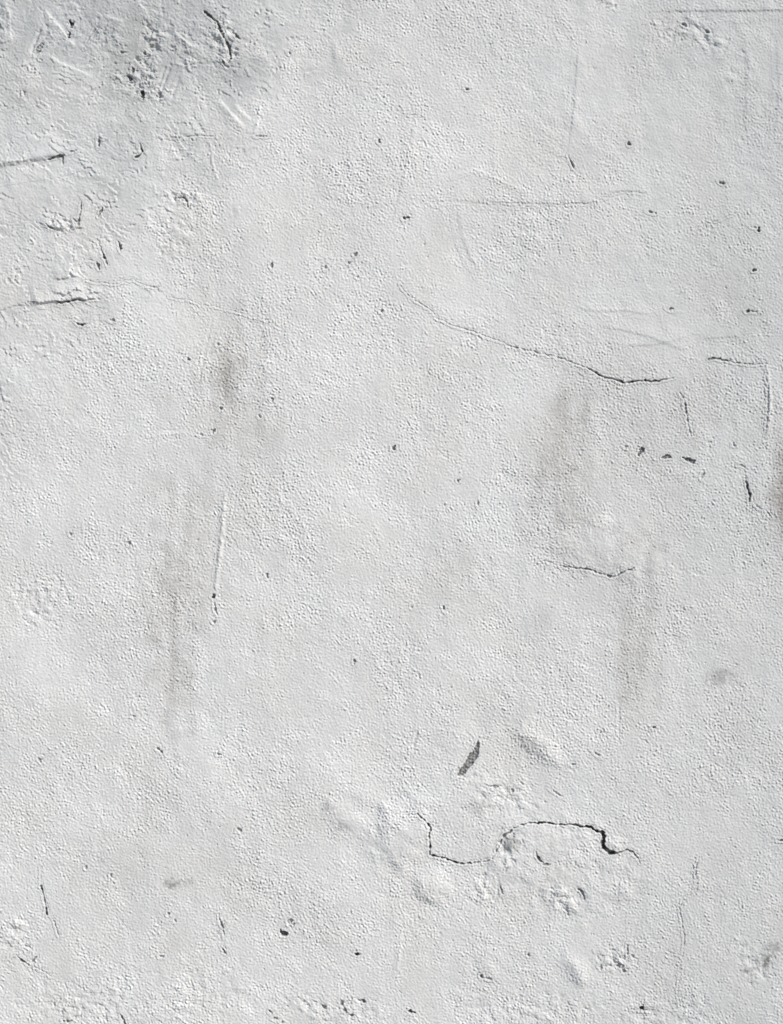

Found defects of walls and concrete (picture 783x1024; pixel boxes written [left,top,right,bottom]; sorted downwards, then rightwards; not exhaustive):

crack [201,8,243,70]
crack [44,148,79,167]
crack [17,277,270,323]
crack [397,282,695,440]
crack [706,354,772,438]
crack [735,462,774,520]
crack [535,557,636,580]
spalling [450,739,482,780]
crack [392,810,642,897]